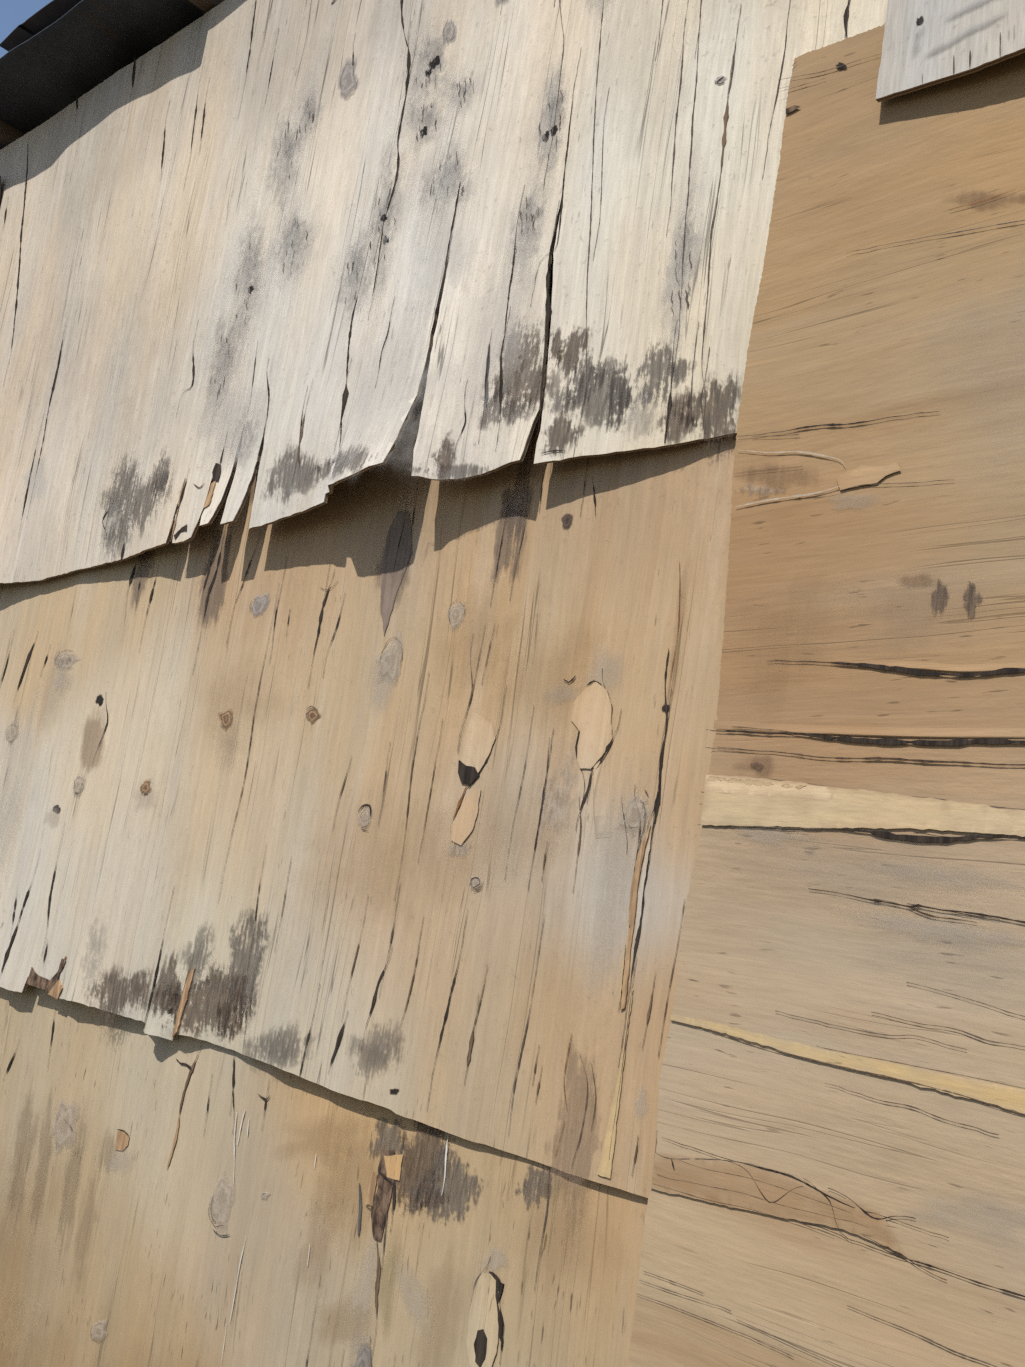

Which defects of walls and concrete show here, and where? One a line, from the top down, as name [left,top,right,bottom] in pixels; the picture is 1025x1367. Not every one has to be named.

crack [292,0,454,485]
crack [454,0,609,454]
leakage [107,458,168,543]
crack [248,342,269,437]
crack [576,378,596,516]
leakage [482,329,737,455]
crack [166,477,544,1169]
leakage [93,911,266,1039]
crack [426,706,593,1111]
crack [642,899,685,1056]